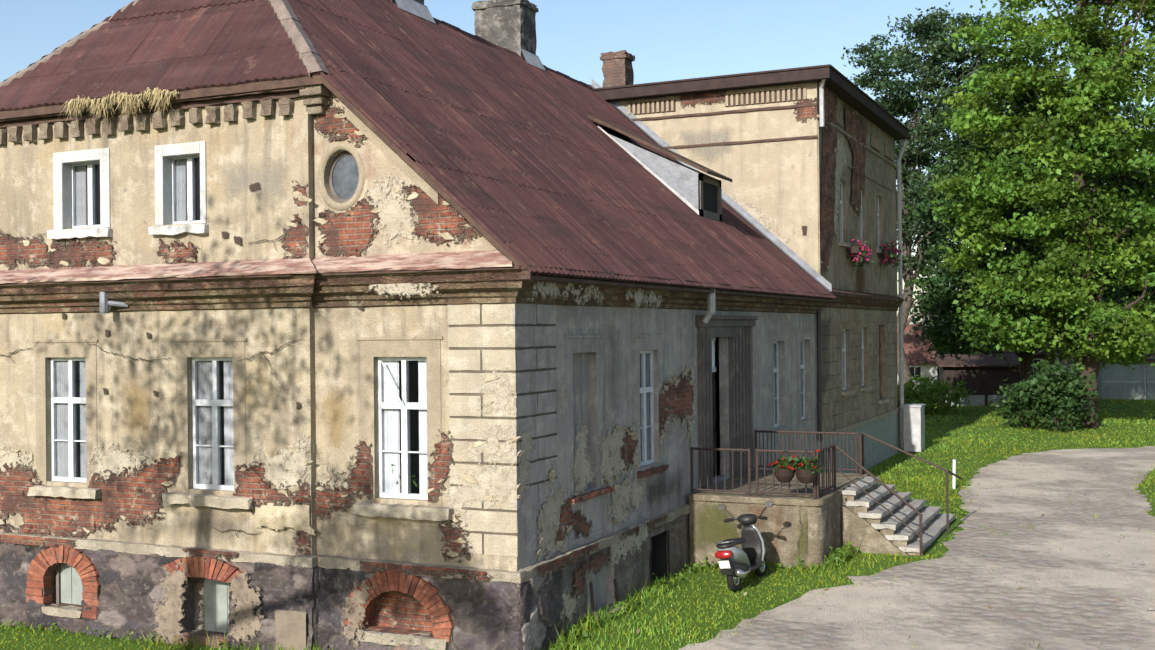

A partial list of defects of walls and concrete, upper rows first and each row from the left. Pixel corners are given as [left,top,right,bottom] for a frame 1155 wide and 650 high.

flaking render [314,99,366,147]
flaking render [0,229,117,270]
flaking render [157,238,199,264]
flaking render [281,173,482,259]
flaking render [369,283,438,297]
flaking render [528,281,608,305]
flaking render [626,288,662,311]
flaking render [793,87,867,274]
flaking render [660,364,697,456]
flaking render [0,442,182,549]
flaking render [232,434,372,556]
flaking render [341,368,668,648]